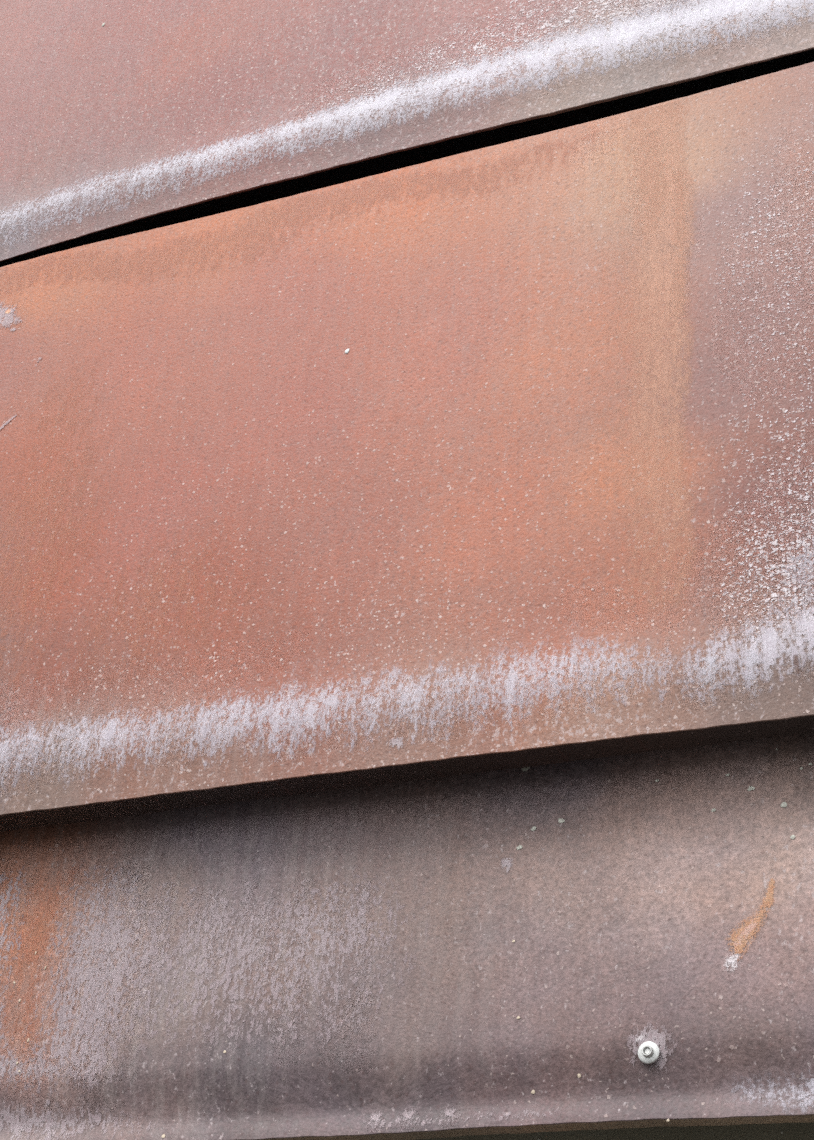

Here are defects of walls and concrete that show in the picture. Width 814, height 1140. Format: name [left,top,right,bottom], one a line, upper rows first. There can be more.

leakage [0,131,814,785]
corrosion [725,879,775,971]